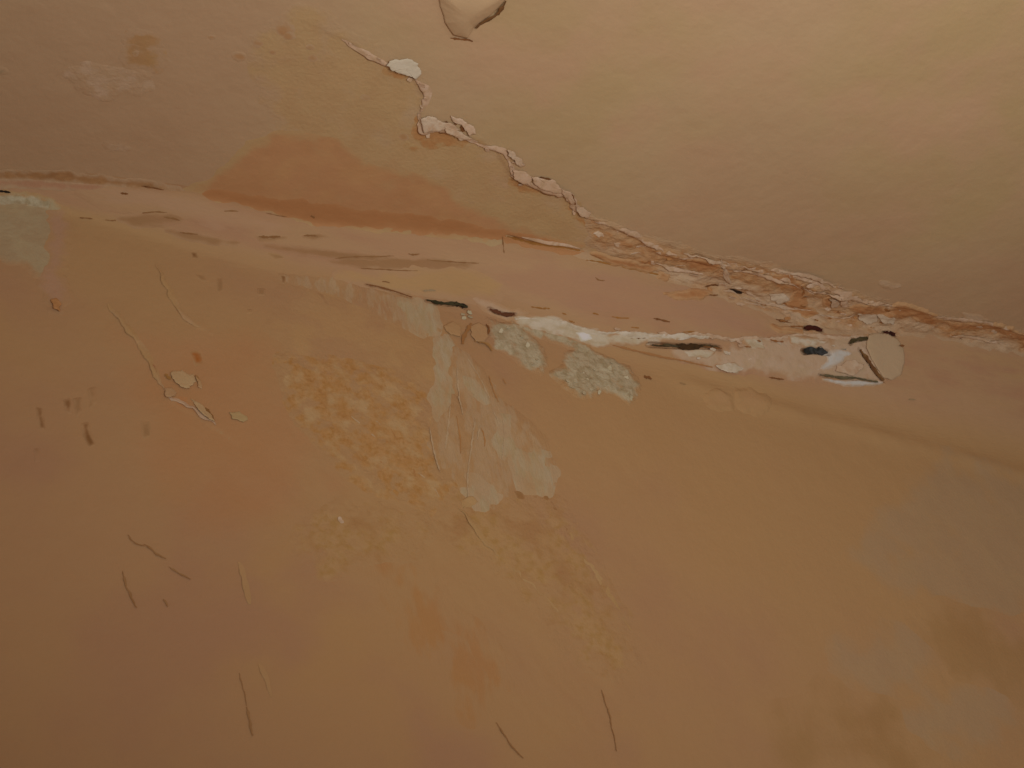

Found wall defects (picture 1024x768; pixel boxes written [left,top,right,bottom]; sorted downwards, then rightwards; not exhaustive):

damp [74,130,772,543]
spalling [342,39,1024,406]